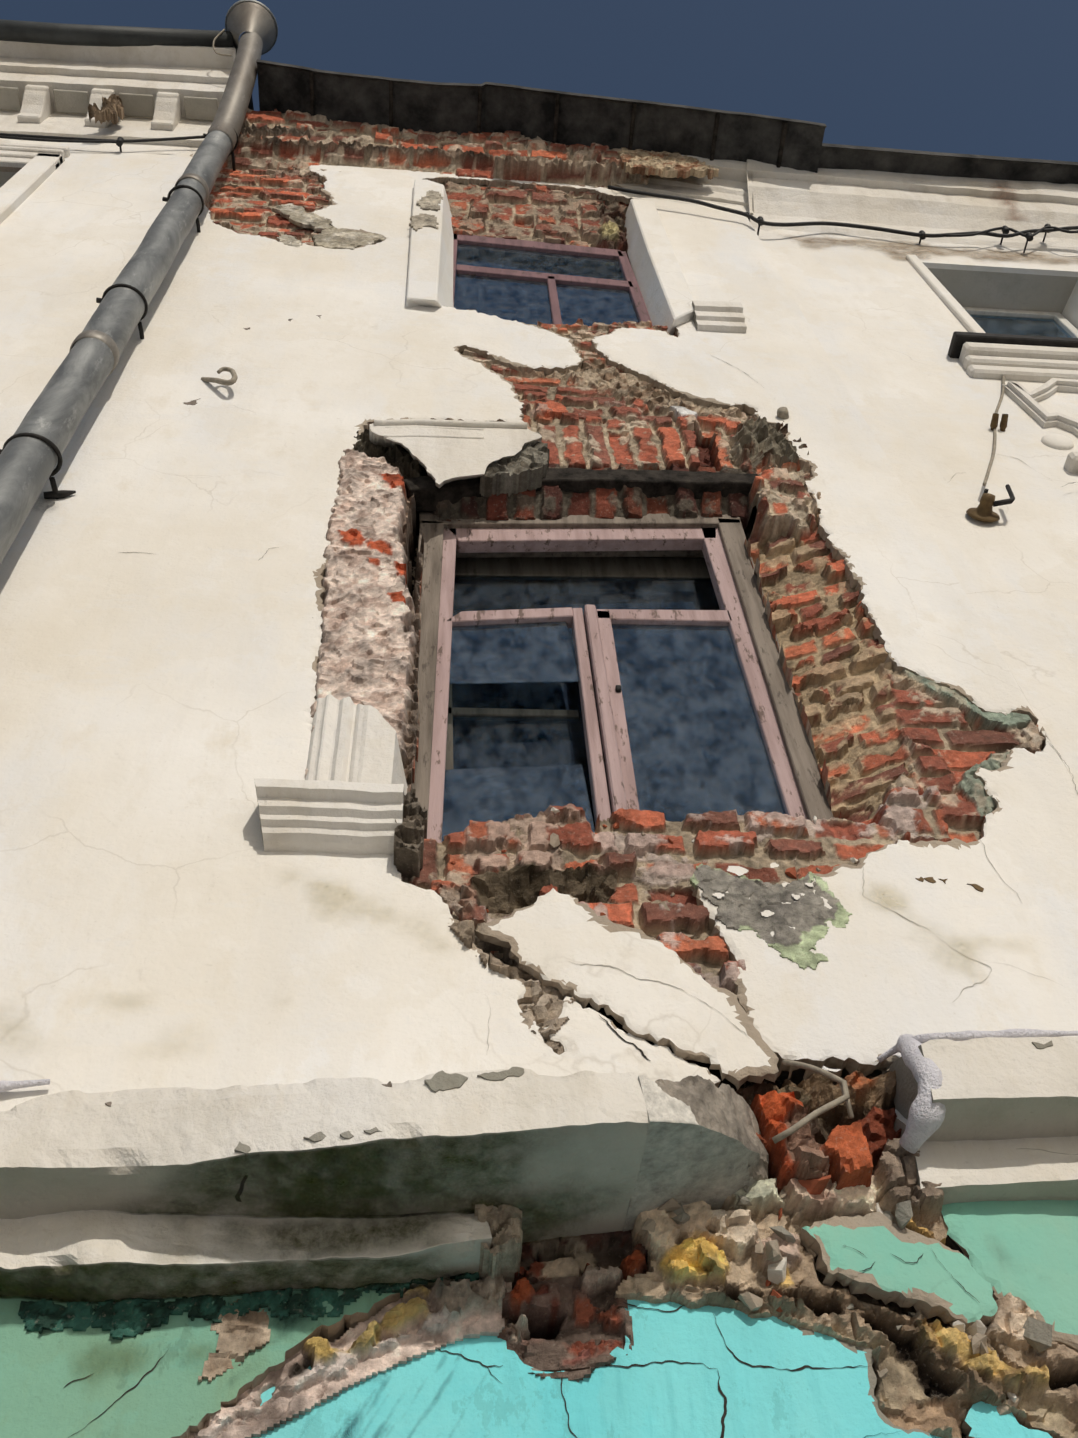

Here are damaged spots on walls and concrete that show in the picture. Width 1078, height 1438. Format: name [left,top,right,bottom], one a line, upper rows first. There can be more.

spalling [209,166,385,250]
peeling [409,190,443,231]
spalling [310,431,424,793]
peeling [901,669,1044,817]
peeling [690,863,853,970]
crack [448,911,784,1092]
leakage [0,1133,520,1340]
spalling [614,1075,1078,1438]
spalling [189,1273,543,1438]
crack [438,1349,503,1384]
crack [558,1302,869,1438]